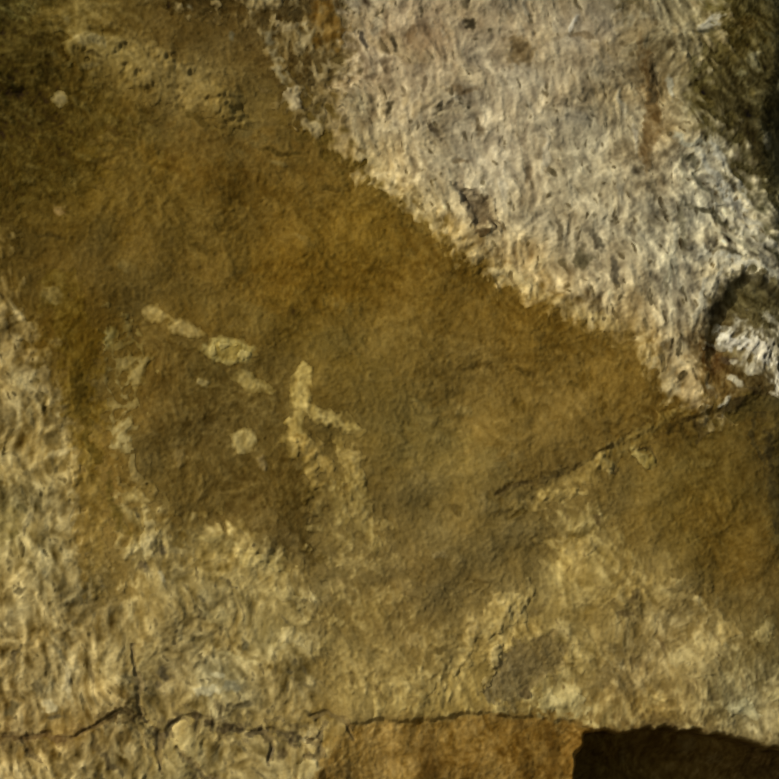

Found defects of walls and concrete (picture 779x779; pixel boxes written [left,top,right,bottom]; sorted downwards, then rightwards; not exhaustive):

crack [0,642,356,779]